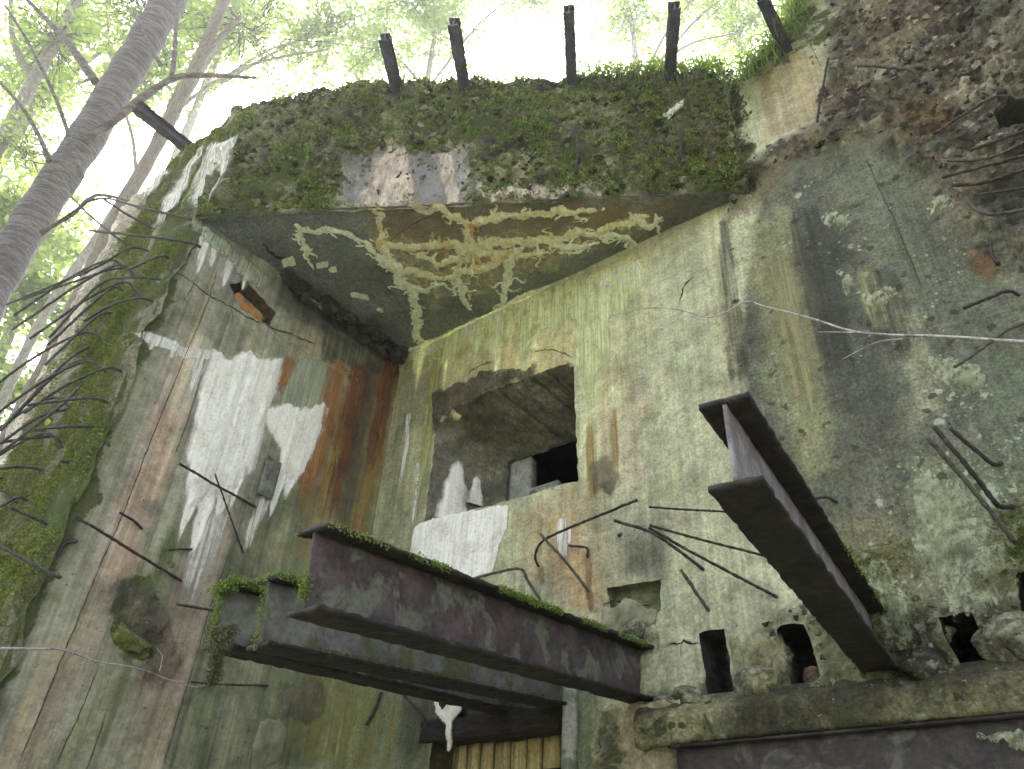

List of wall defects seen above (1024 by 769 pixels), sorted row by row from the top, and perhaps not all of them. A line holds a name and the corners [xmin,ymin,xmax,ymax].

spalling [816,57,829,123]
damp [282,200,664,393]
damp [720,222,746,378]
damp [770,212,846,413]
damp [859,271,910,350]
rust [277,357,294,391]
rust [299,358,398,533]
spalling [431,364,535,431]
crack [17,269,315,768]
spalling [178,462,257,554]
spalling [474,499,778,612]
spalling [600,598,657,631]